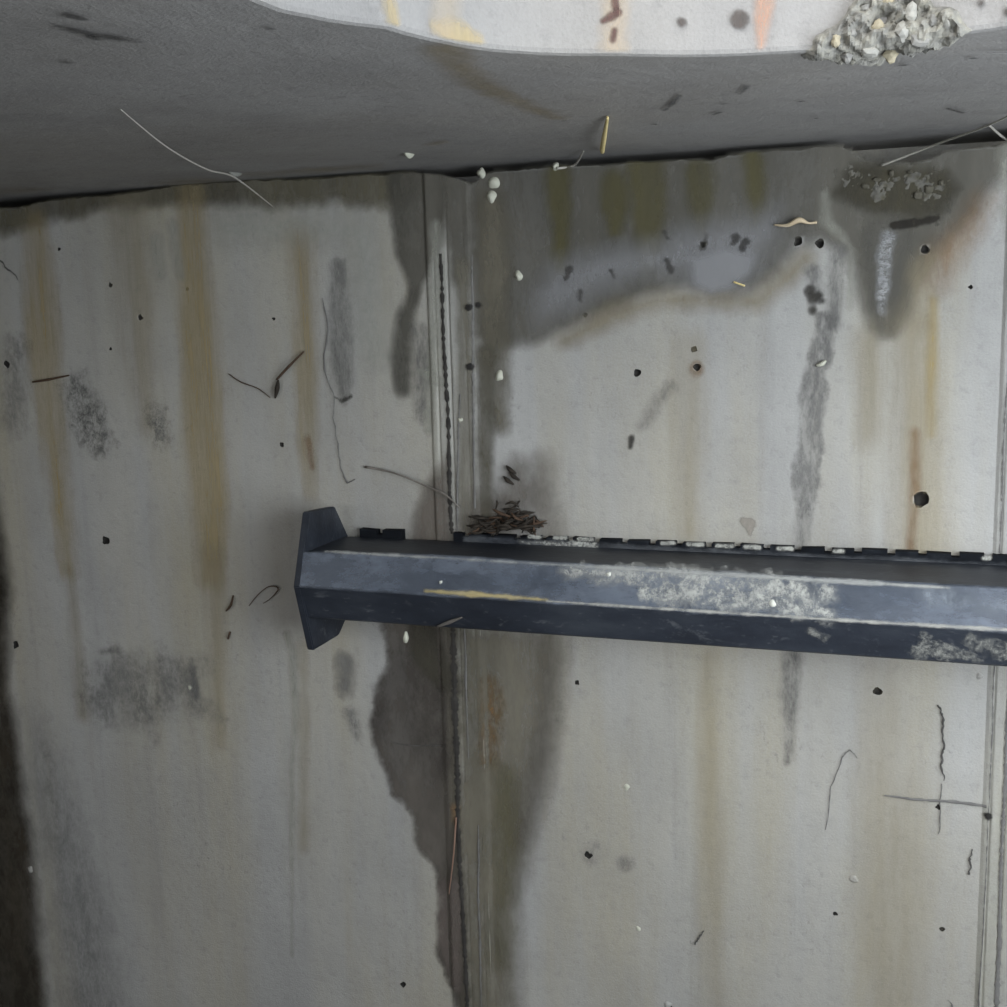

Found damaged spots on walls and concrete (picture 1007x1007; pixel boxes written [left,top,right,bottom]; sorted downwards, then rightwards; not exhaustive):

spalling [801,0,972,67]
damp [0,142,1007,541]
damp [0,534,43,1007]
damp [371,623,557,1007]
damp [425,590,542,600]
crack [884,705,987,834]